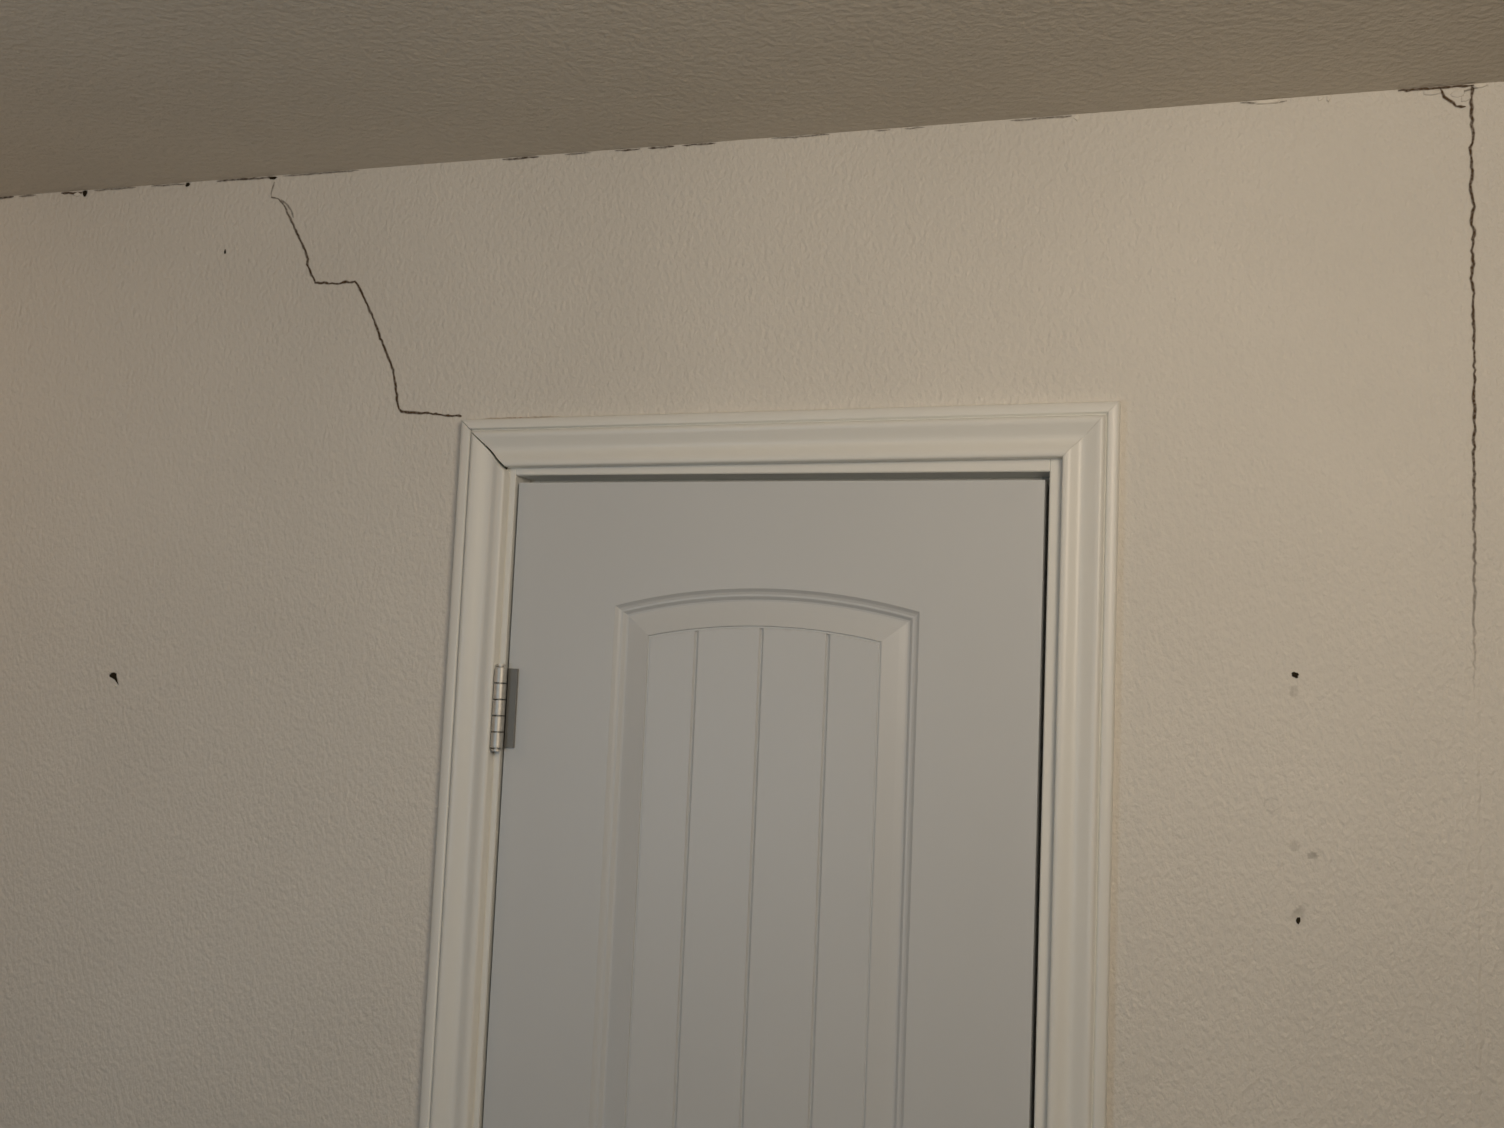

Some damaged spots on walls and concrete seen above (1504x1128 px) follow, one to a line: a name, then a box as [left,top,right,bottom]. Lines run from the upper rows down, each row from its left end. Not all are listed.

crack [0,170,462,417]
crack [1398,83,1488,562]